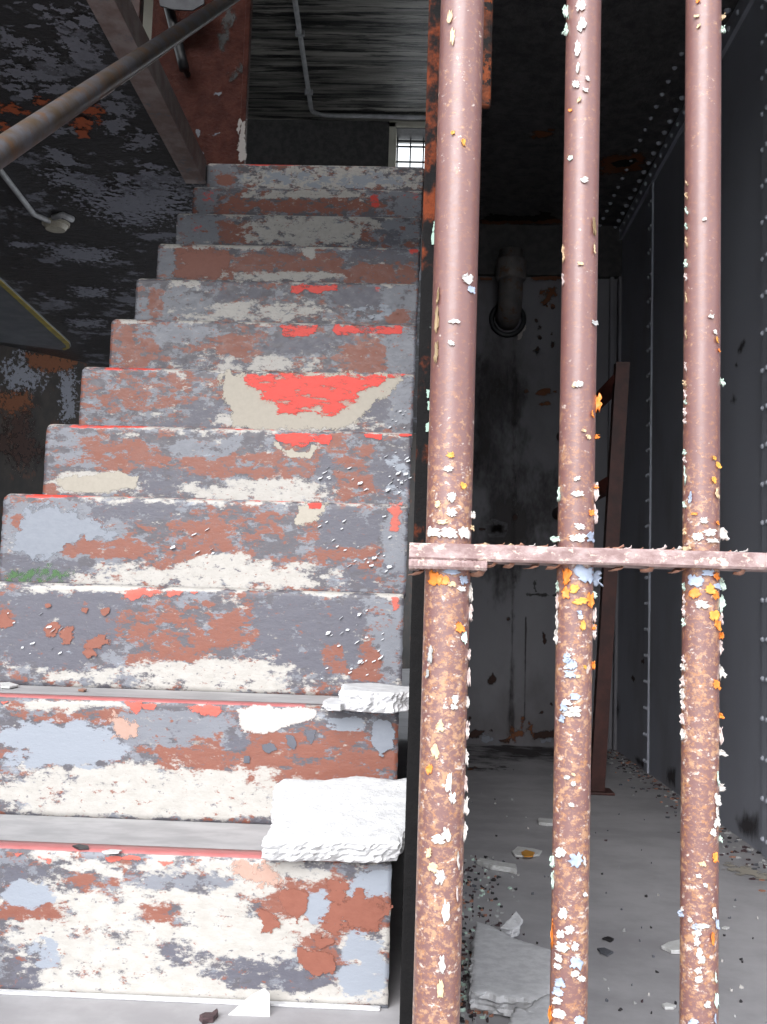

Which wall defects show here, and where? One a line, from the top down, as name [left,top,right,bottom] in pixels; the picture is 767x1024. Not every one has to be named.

peeling [5,240,126,266]
peeling [171,246,230,280]
peeling [44,285,117,329]
peeling [0,349,80,423]
peeling [55,470,139,494]
peeling [11,500,118,562]
peeling [39,603,111,659]
peeling [236,697,345,753]
peeling [370,719,396,757]
peeling [257,885,309,934]
peeling [297,877,393,976]
spalling [228,988,270,1017]